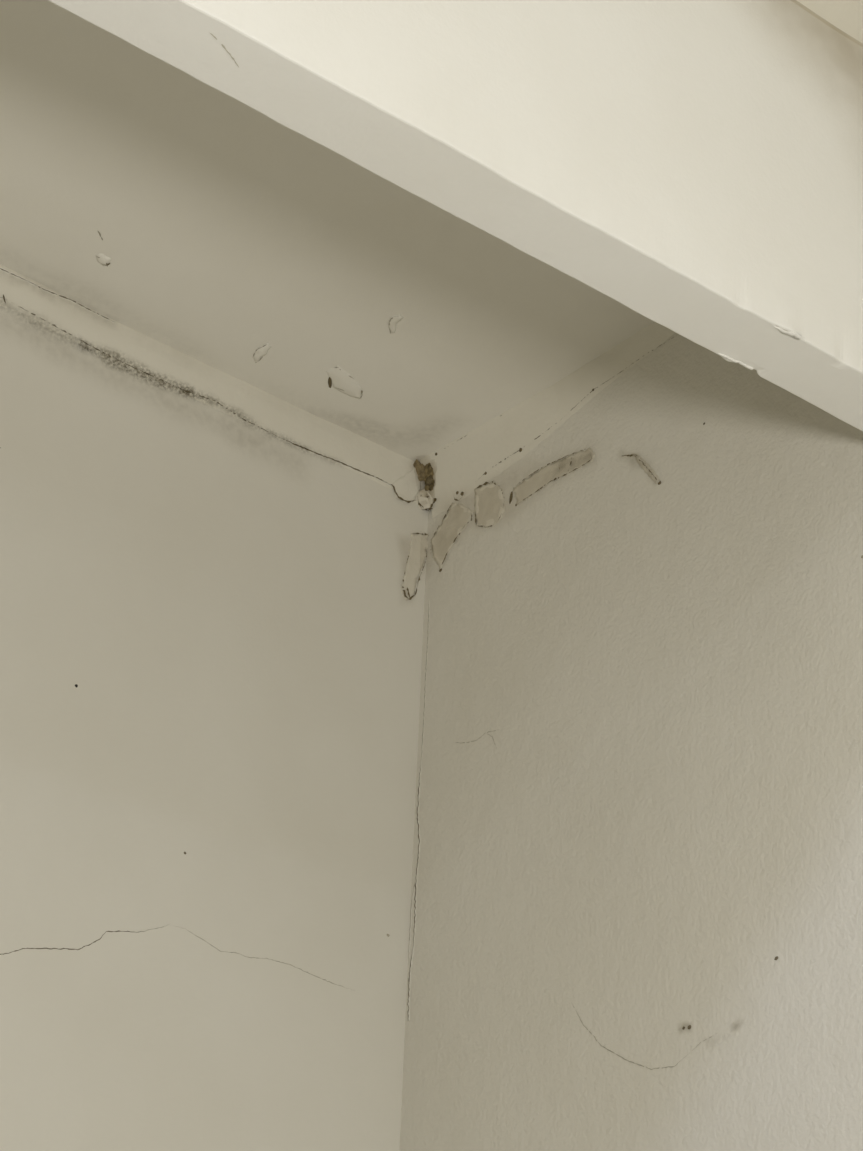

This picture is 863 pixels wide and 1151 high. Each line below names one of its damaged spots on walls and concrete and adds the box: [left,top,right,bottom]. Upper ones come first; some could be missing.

crack [0,267,391,486]
peeling [391,448,595,600]
crack [0,923,356,992]